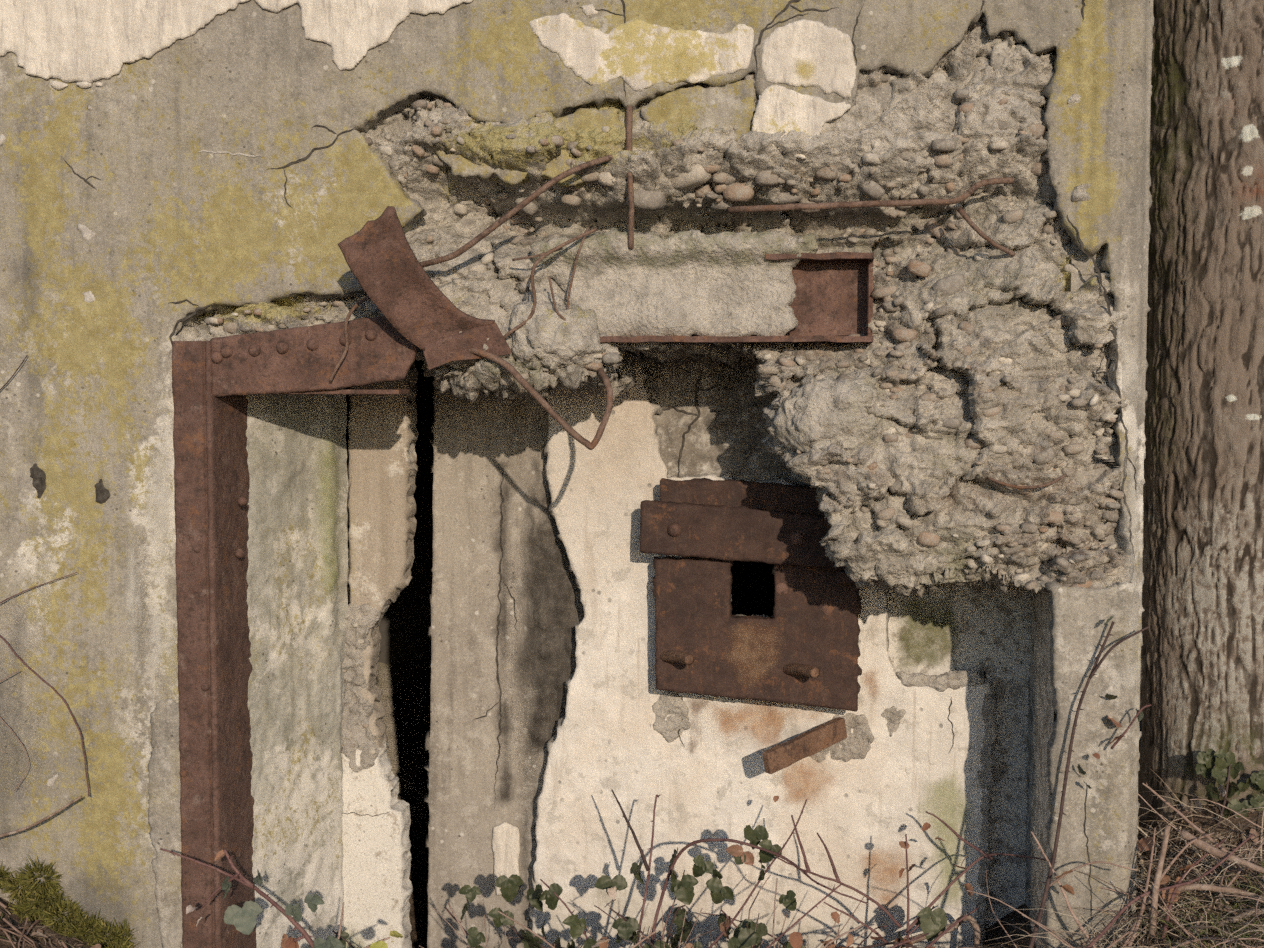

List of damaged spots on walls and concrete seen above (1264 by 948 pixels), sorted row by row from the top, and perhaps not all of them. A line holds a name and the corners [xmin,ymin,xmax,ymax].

flaking render [0,0,474,90]
crack [199,125,356,206]
spalling [176,293,383,341]
spalling [357,0,1132,601]
spalling [341,603,381,773]
peeling [492,822,521,895]